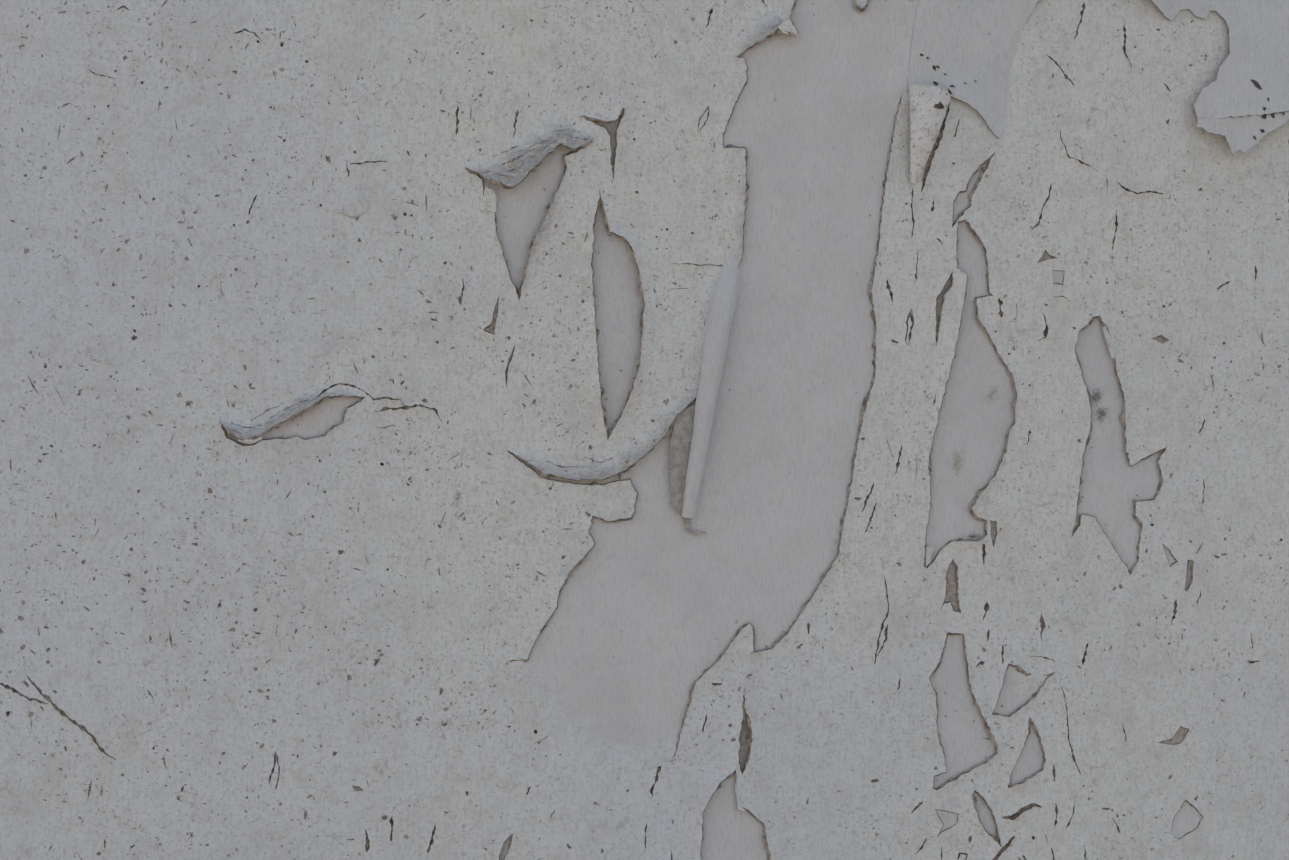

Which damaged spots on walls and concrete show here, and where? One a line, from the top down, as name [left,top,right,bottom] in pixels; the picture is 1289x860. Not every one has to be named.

peeling [1151,0,1289,156]
peeling [207,378,375,454]
peeling [457,0,1065,860]
peeling [1062,306,1174,583]
peeling [1162,544,1194,592]
crack [0,675,116,760]
peeling [1159,726,1189,745]
peeling [1170,799,1203,839]